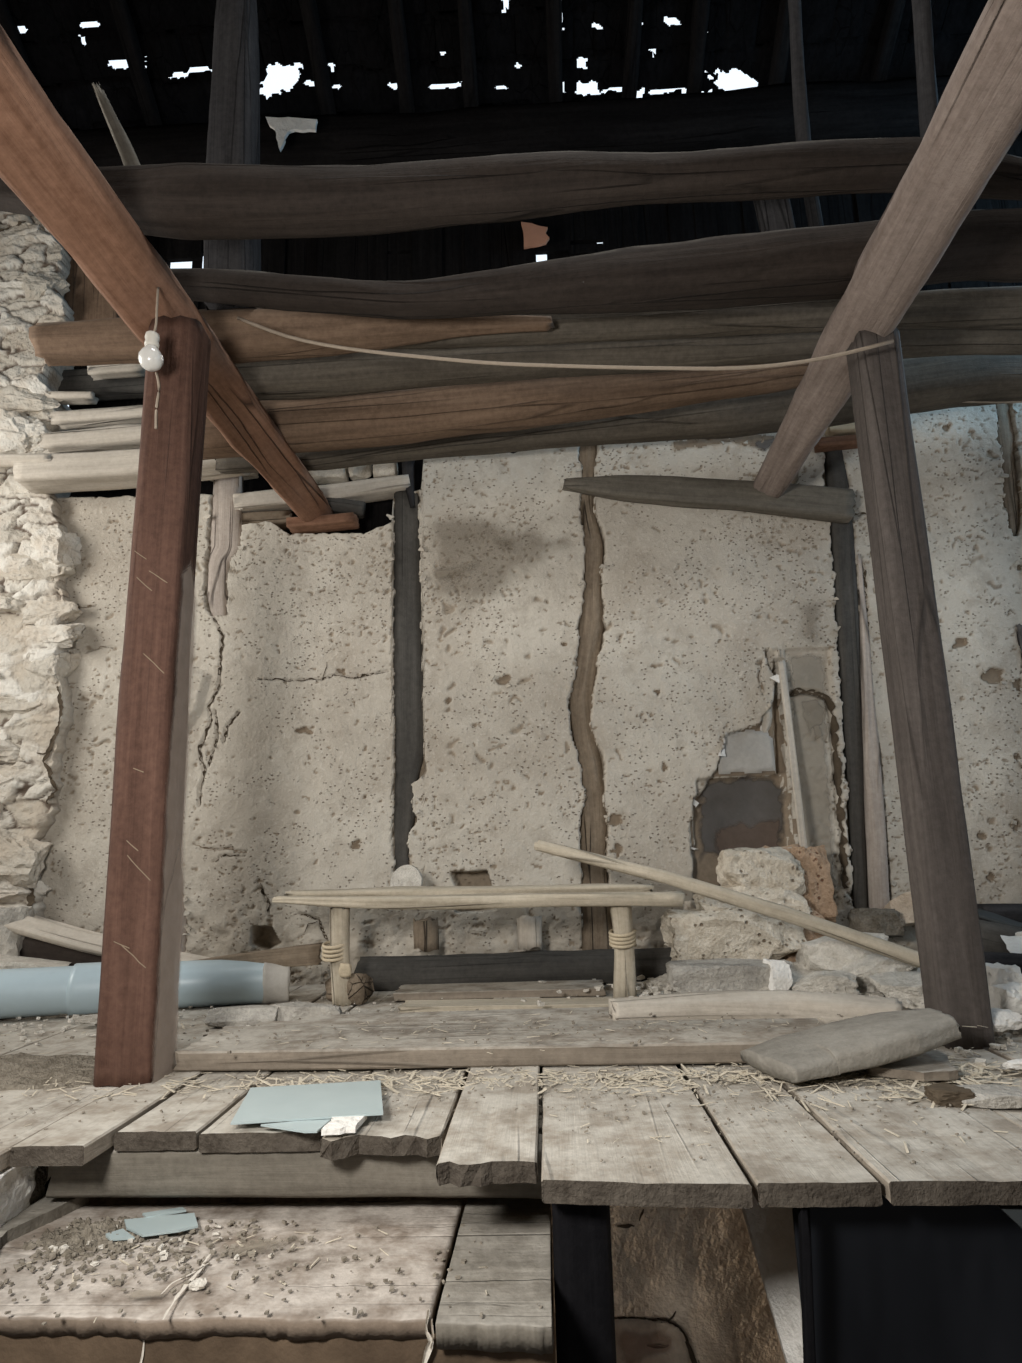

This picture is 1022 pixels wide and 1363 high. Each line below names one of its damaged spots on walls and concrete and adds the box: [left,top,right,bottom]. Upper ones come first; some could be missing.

crack [198,618,240,803]
crack [196,845,246,862]
crack [301,914,330,945]
flaking render [690,655,869,909]